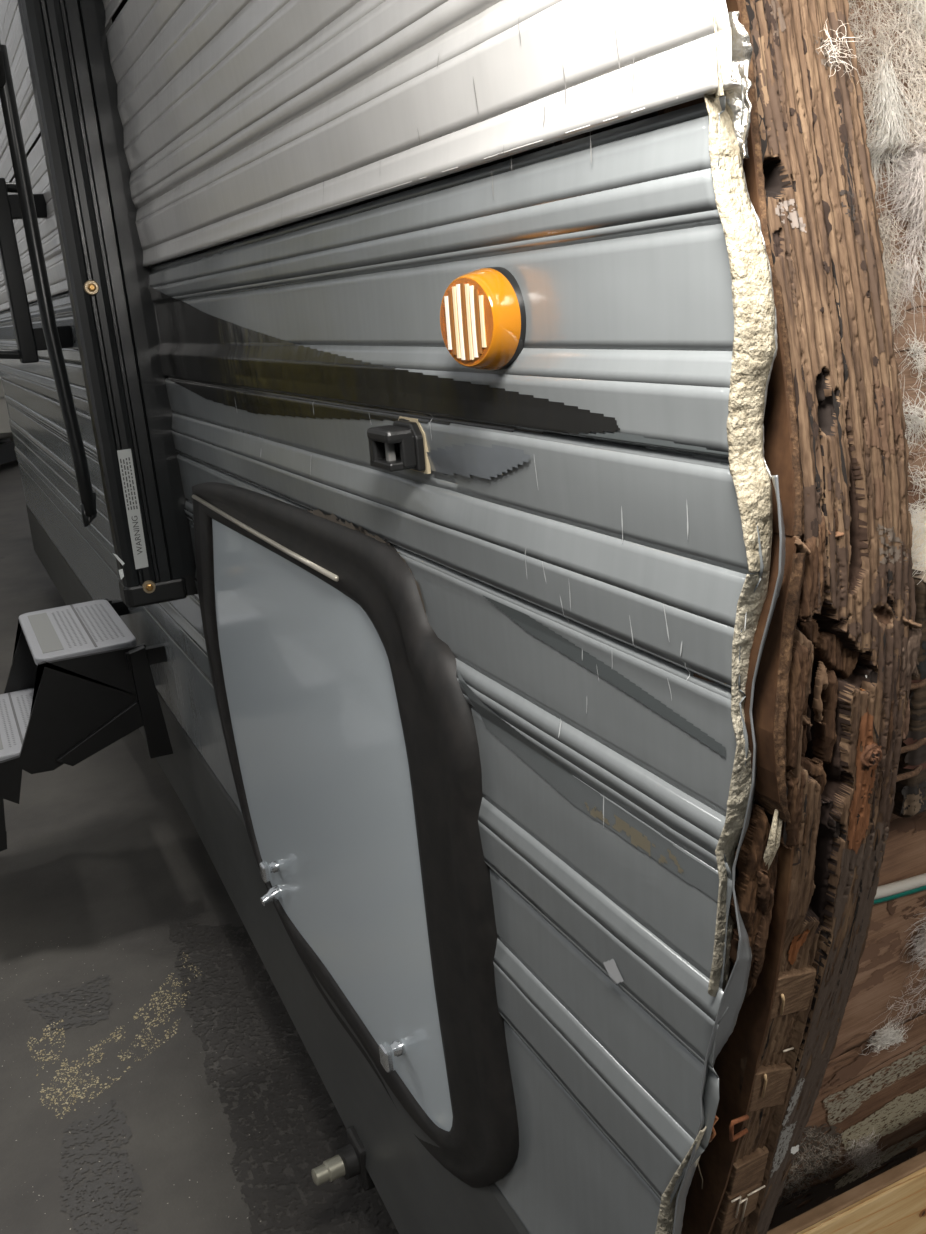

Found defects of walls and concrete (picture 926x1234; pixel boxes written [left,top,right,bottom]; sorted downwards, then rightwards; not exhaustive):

hole [763,157,797,199]
hole [873,596,898,626]
spalling [771,365,878,1176]
water stain [757,468,926,1234]
corrosion [847,708,881,854]
peeling [903,789,924,816]